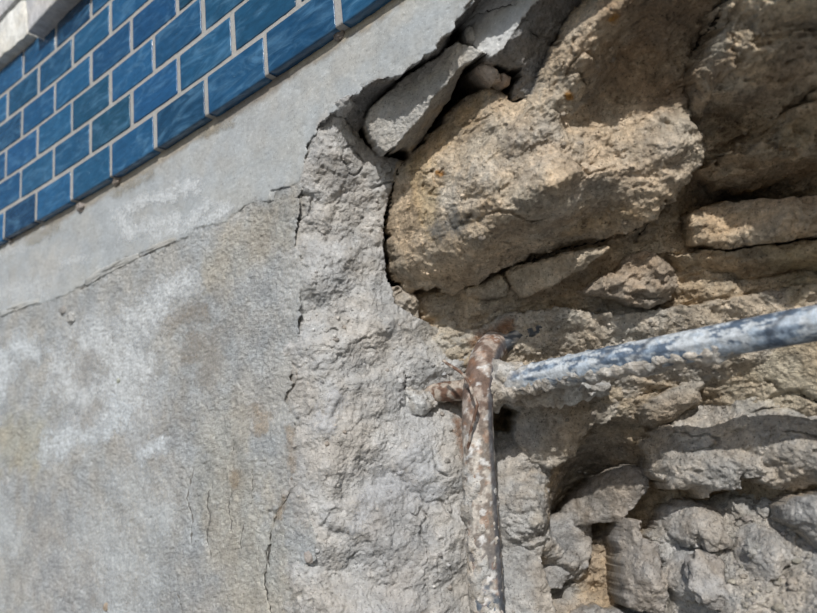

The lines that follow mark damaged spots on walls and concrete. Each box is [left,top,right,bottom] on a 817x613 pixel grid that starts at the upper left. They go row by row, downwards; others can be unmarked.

crack [691,0,729,56]
peeling [85,237,176,286]
spalling [281,0,817,613]